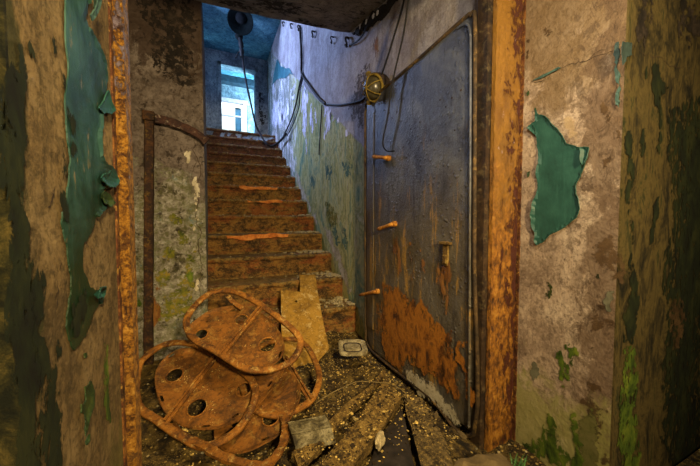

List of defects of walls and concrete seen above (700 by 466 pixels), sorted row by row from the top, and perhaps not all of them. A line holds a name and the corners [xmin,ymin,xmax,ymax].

water stain [635,0,654,51]
water stain [348,63,372,130]
flaking render [600,41,632,124]
peeling [52,0,120,350]
peeling [526,107,589,245]
flaking render [592,235,626,284]
water stain [623,128,646,345]
water stain [650,196,660,244]
rust [375,282,475,407]
water stain [555,343,579,387]
water stain [569,408,599,466]
flaking render [580,381,608,439]